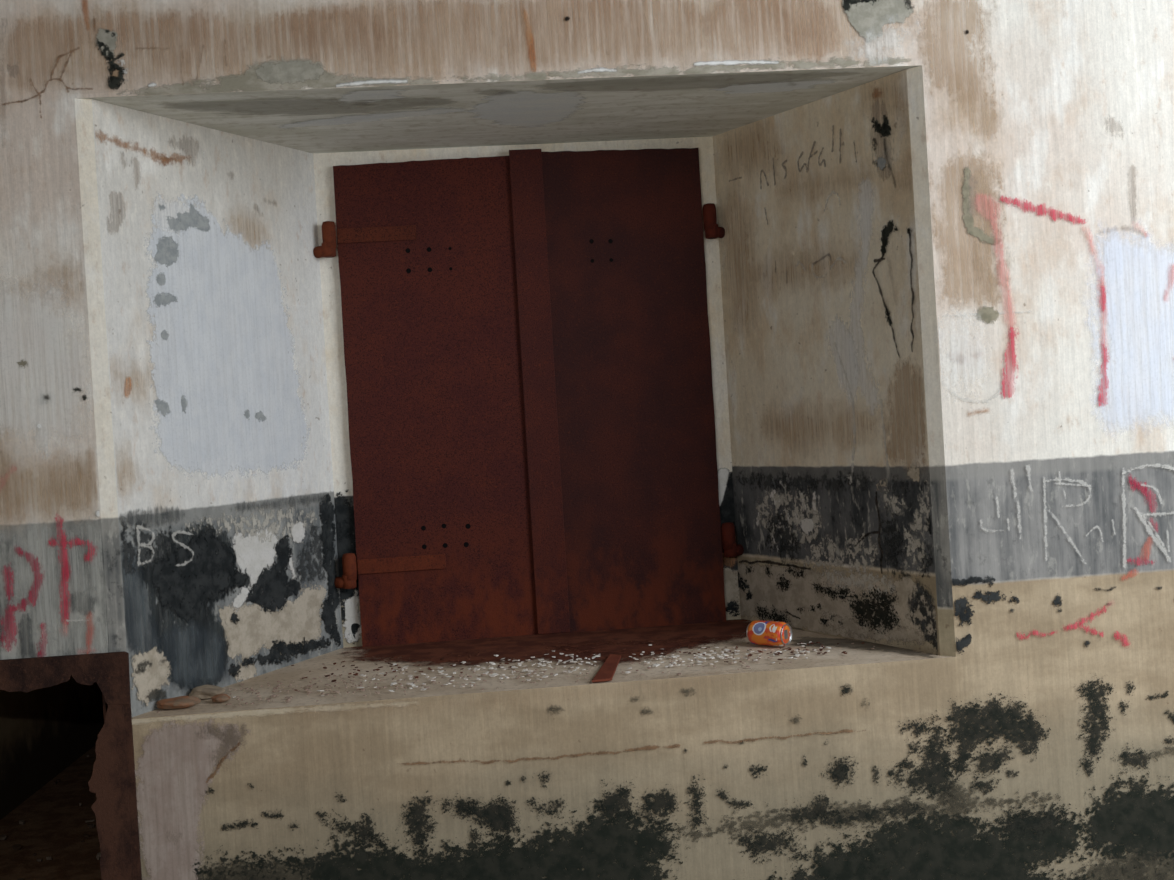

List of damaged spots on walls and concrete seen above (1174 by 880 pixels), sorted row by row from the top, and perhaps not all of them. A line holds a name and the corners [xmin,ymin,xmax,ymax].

crack [3,19,95,118]
spalling [96,0,914,129]
crack [872,220,914,357]
rust [343,619,751,666]
damp [738,560,938,658]
damp [193,673,1174,880]